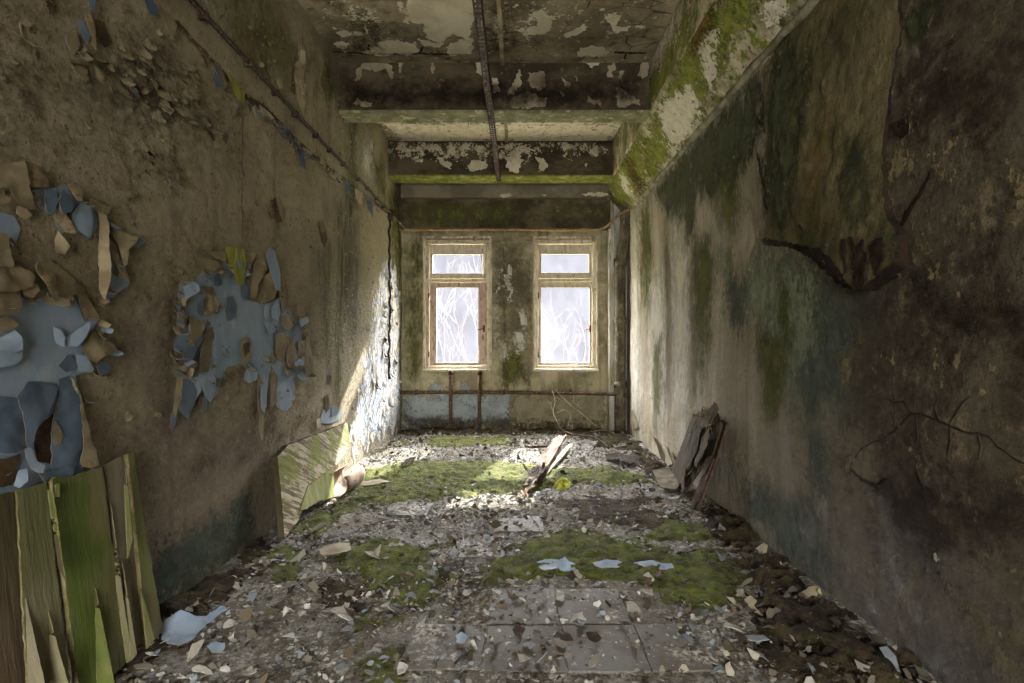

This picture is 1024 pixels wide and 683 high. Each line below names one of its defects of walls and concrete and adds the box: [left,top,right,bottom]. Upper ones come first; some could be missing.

peeling [323,0,547,109]
peeling [492,0,646,108]
peeling [637,6,678,80]
leakage [893,0,1024,149]
peeling [376,122,622,184]
crack [900,168,933,227]
peeling [0,161,145,494]
peeling [169,246,606,465]
leakage [494,247,529,386]
leakage [629,157,862,590]
crack [849,394,1024,495]